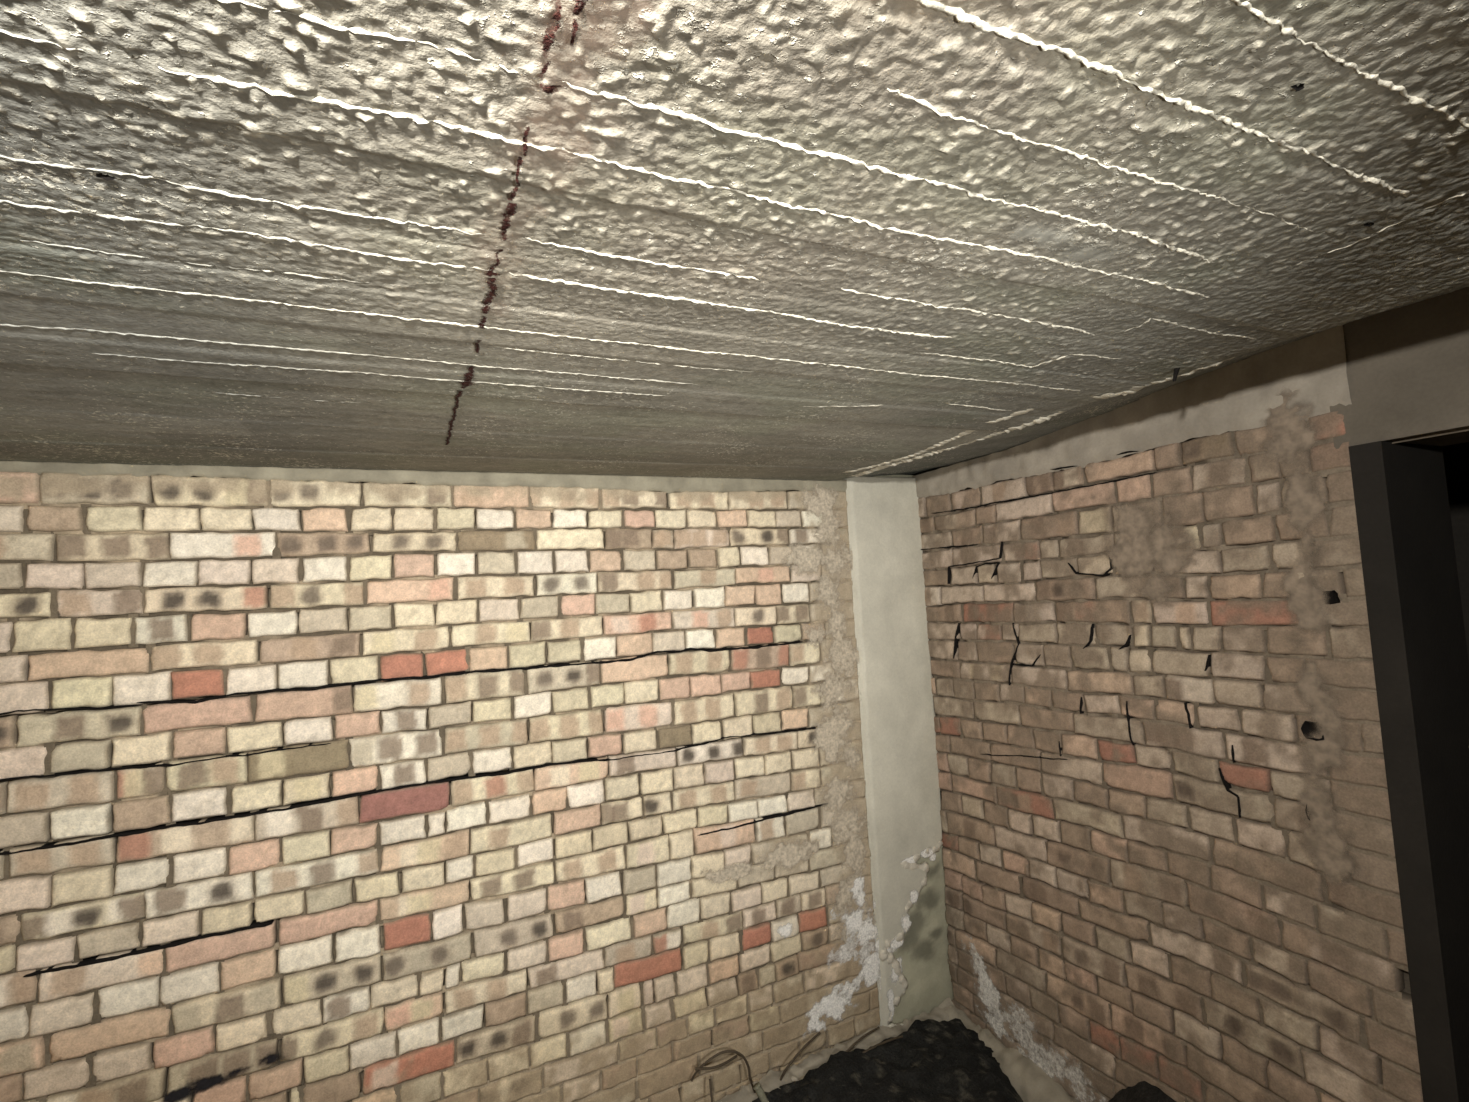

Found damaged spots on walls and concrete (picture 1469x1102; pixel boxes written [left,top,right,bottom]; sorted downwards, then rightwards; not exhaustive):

corrosion [538,0,588,94]
corrosion [445,126,530,445]
crack [921,451,1158,584]
crack [953,623,961,659]
crack [1008,623,1041,685]
crack [1083,624,1131,650]
crack [1126,701,1136,745]
crack [1184,655,1211,729]
crack [1218,745,1241,817]
crack [23,919,275,977]
damp [806,877,902,1032]
damp [971,938,1105,1102]